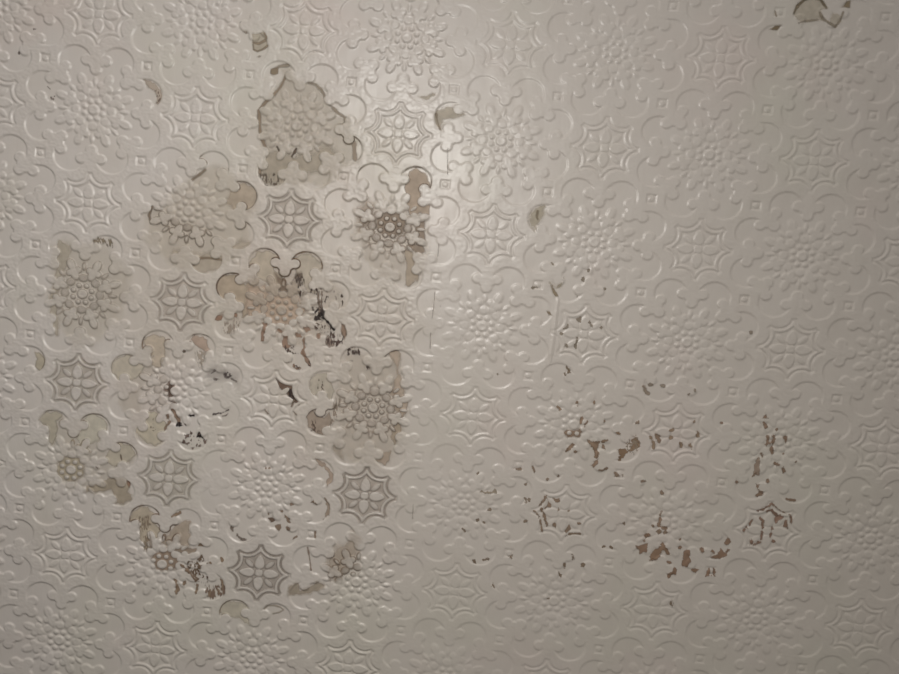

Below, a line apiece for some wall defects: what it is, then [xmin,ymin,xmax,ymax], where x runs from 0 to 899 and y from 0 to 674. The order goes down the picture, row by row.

peeling [564,417,700,477]
peeling [752,415,787,497]
peeling [174,543,225,599]
peeling [268,503,298,539]
peeling [523,495,581,535]
peeling [636,511,731,578]
peeling [742,503,792,546]